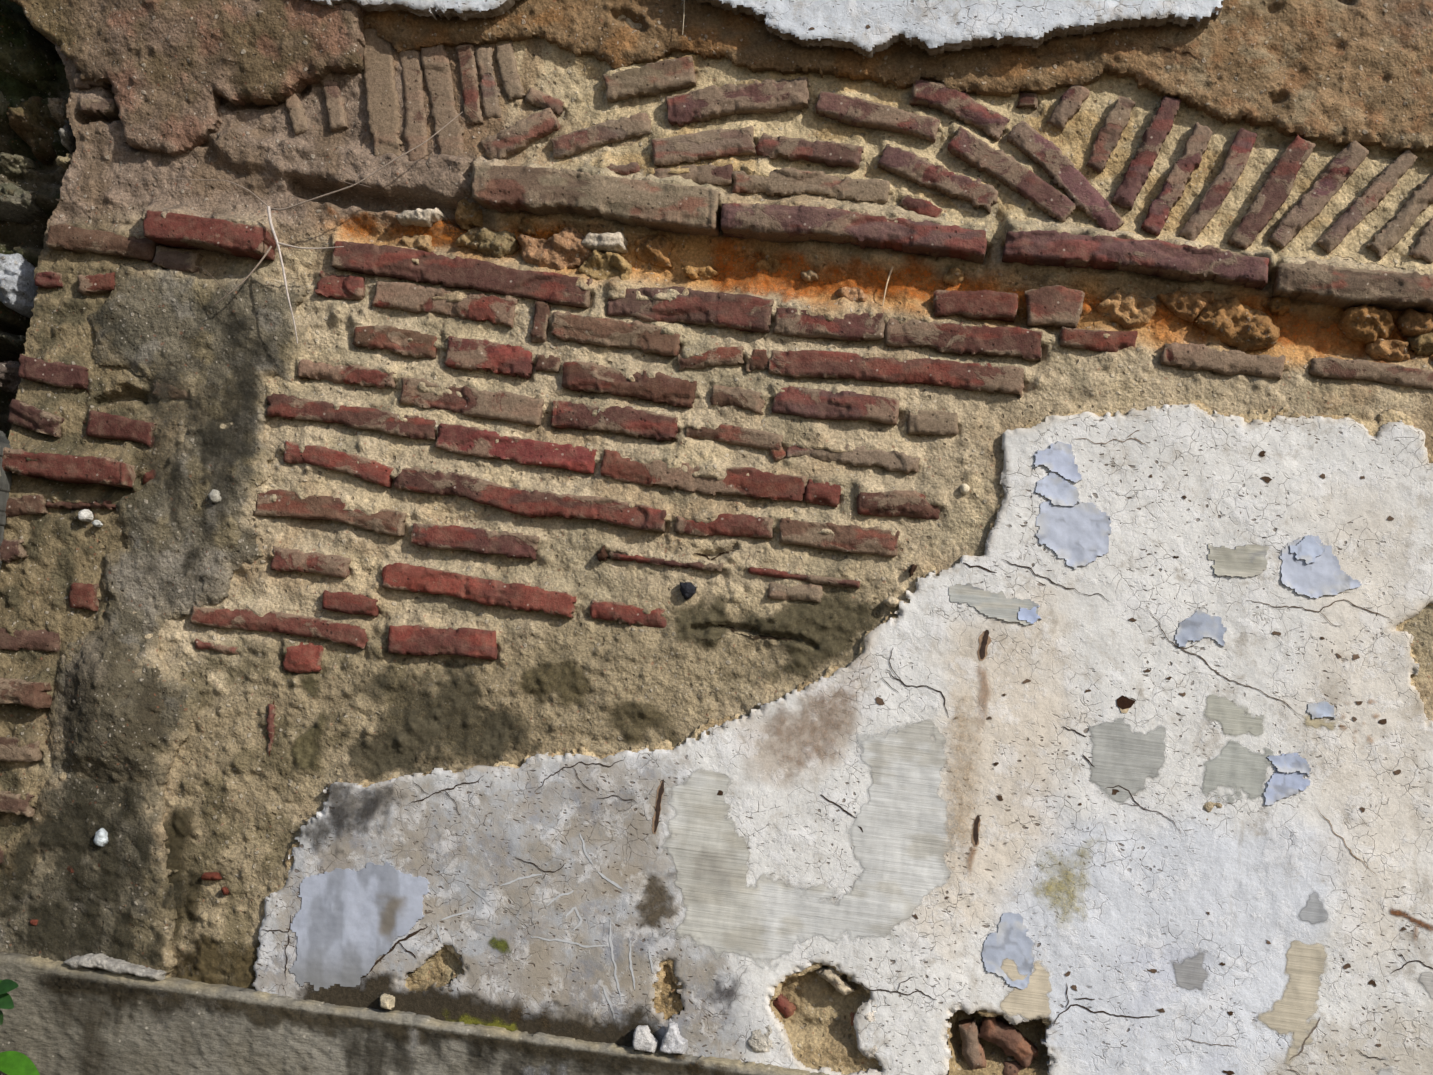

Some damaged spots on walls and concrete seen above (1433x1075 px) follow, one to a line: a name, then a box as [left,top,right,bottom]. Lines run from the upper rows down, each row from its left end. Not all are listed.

water stain [150,314,282,528]
crack [963,559,1108,601]
crack [1146,605,1300,715]
water stain [292,713,325,770]
water stain [300,661,540,848]
peeling [289,862,430,991]
water stain [0,783,749,1075]
crack [360,926,428,978]
spalling [633,964,688,1054]
peeling [662,719,956,1075]
spalling [946,912,1077,1075]
crack [1053,983,1159,1026]